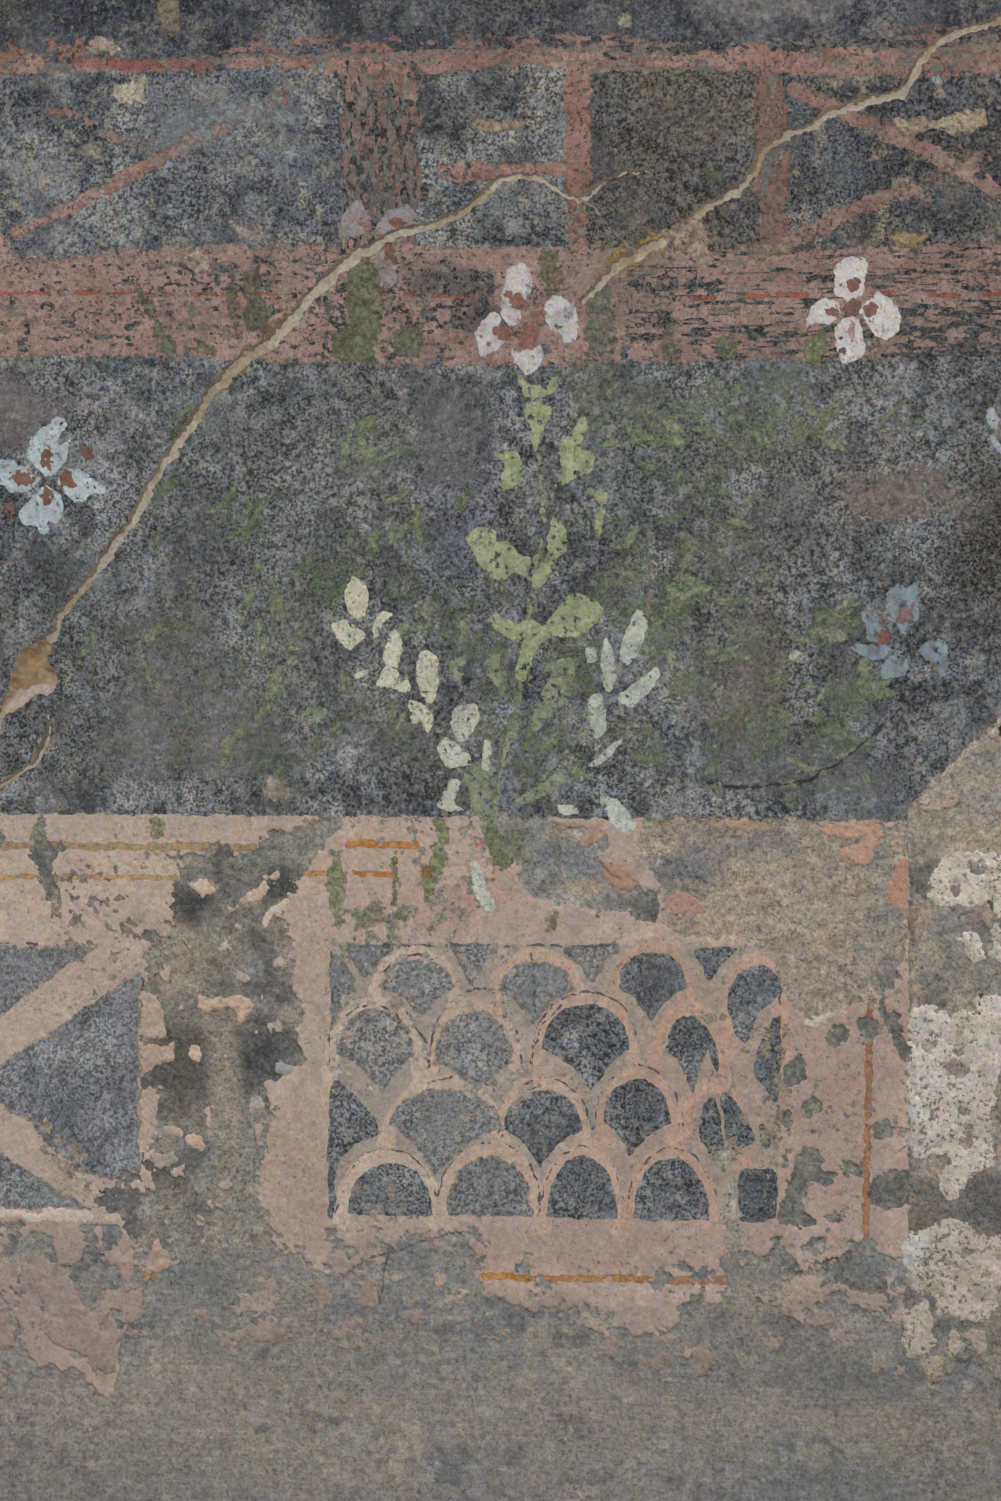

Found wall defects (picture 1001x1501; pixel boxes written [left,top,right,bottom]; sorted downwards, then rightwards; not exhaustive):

crack [43,12,1001,644]
crack [0,693,9,729]
crack [0,714,51,789]
crack [706,700,910,789]
peeling [0,716,1001,1501]